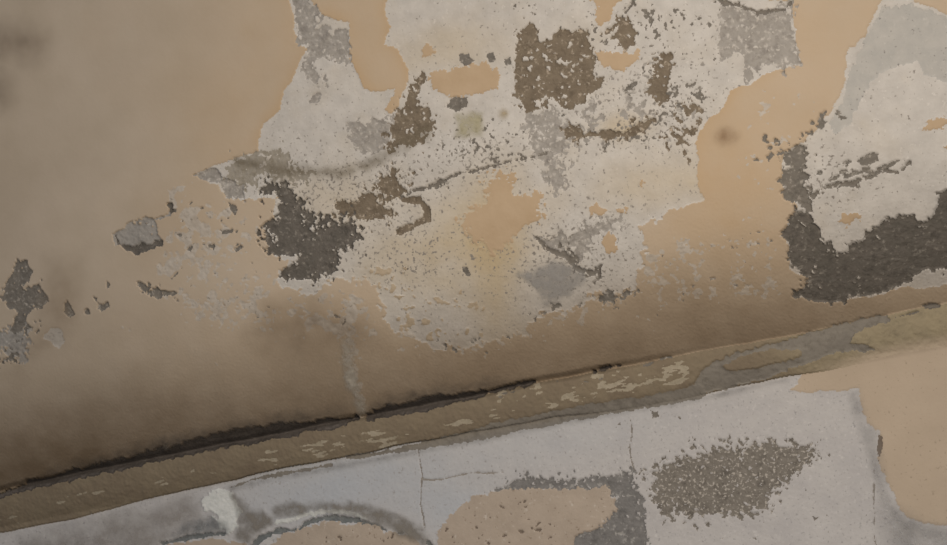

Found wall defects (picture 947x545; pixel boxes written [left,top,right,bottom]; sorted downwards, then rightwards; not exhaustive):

crack [621,0,637,19]
crack [713,0,792,17]
peeling [193,0,947,359]
spalling [112,186,204,256]
spalling [0,259,49,364]
spalling [137,268,182,302]
leakage [0,345,536,499]
peeling [0,315,947,545]
leakage [345,384,706,460]
leakage [127,463,433,545]